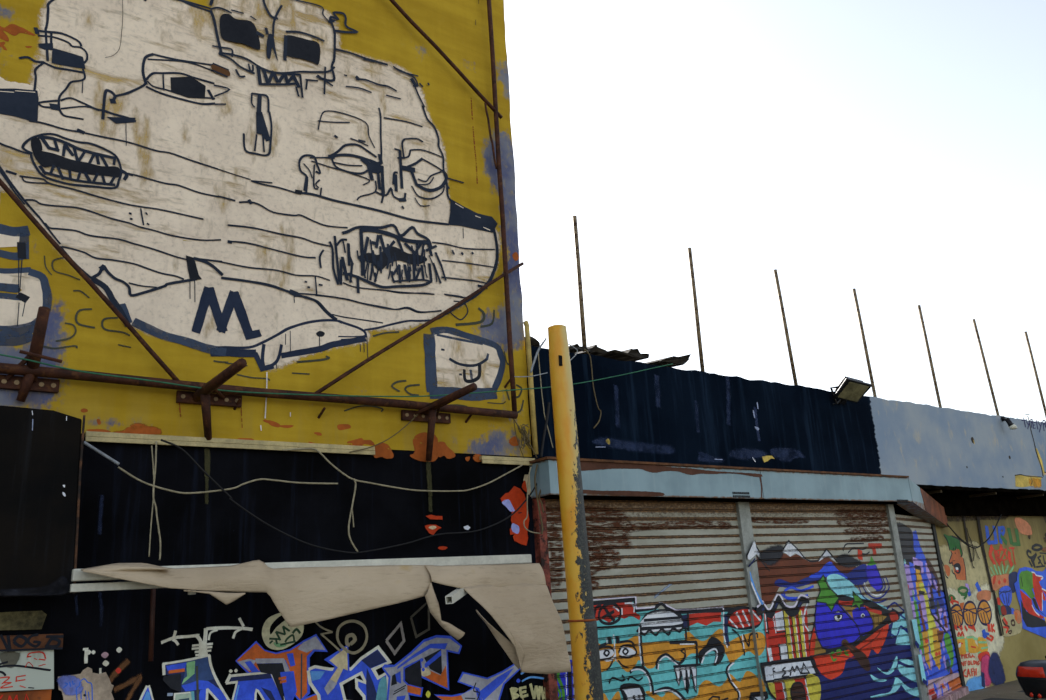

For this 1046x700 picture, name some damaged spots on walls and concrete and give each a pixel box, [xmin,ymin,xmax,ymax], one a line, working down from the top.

peeling [410,432,482,462]
peeling [501,474,531,546]
rust [546,504,563,586]
rust [583,490,731,591]
rust [580,461,763,498]
flaking render [1002,472,1046,488]